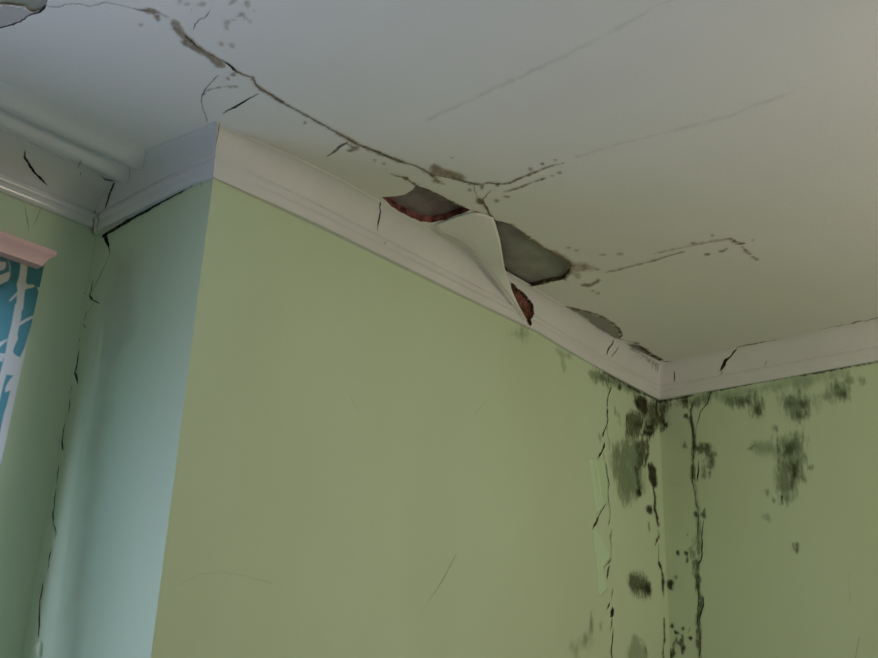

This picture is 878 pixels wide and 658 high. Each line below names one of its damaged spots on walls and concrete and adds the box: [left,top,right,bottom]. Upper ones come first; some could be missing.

spalling [0,0,48,12]
crack [24,150,48,186]
crack [185,12,495,220]
peeling [436,213,533,326]
peeling [565,306,623,338]
crack [38,161,115,636]
crack [593,387,612,528]
water stain [604,372,691,526]
water stain [696,443,716,468]
crack [689,393,711,658]
water stain [629,573,651,597]
water stain [663,618,692,658]